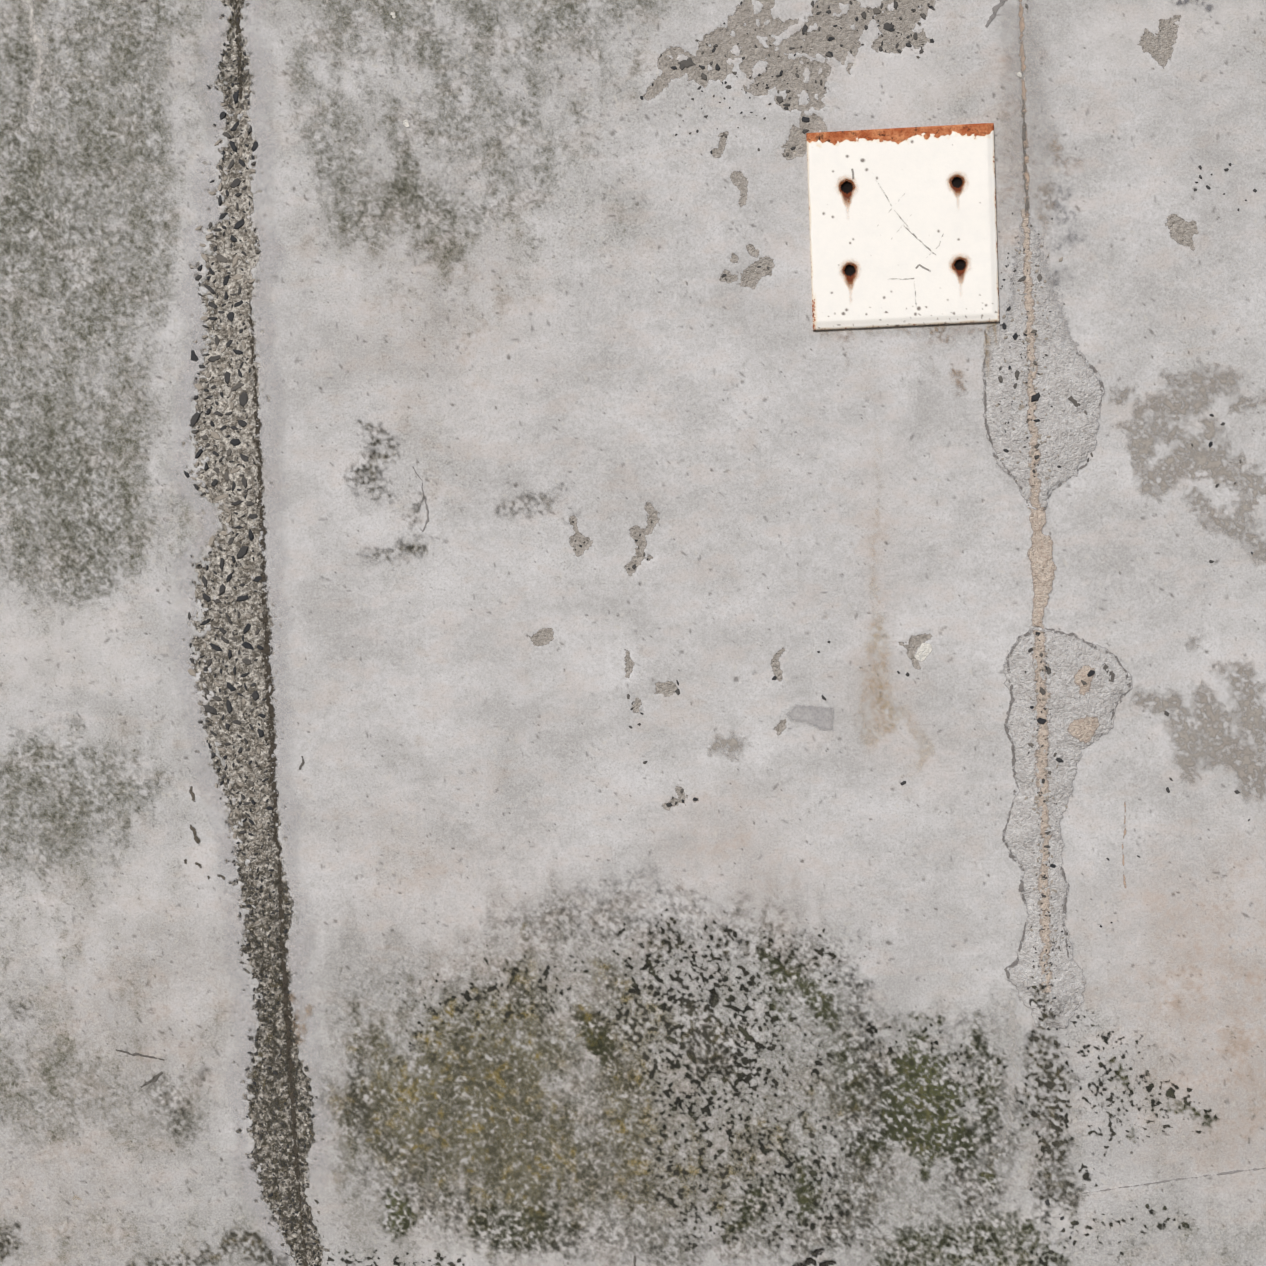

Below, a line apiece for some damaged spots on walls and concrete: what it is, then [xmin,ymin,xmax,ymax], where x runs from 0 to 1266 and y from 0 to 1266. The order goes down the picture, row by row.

damp [8,0,54,117]
spalling [640,0,936,160]
rust [838,179,856,204]
rust [842,262,858,286]
rust [949,174,965,195]
rust [951,257,968,280]
crack [985,0,1030,216]
spalling [1115,372,1266,561]
spalling [182,0,324,1266]
spalling [1135,664,1266,798]
damp [597,909,796,1179]
damp [1010,976,1217,1255]